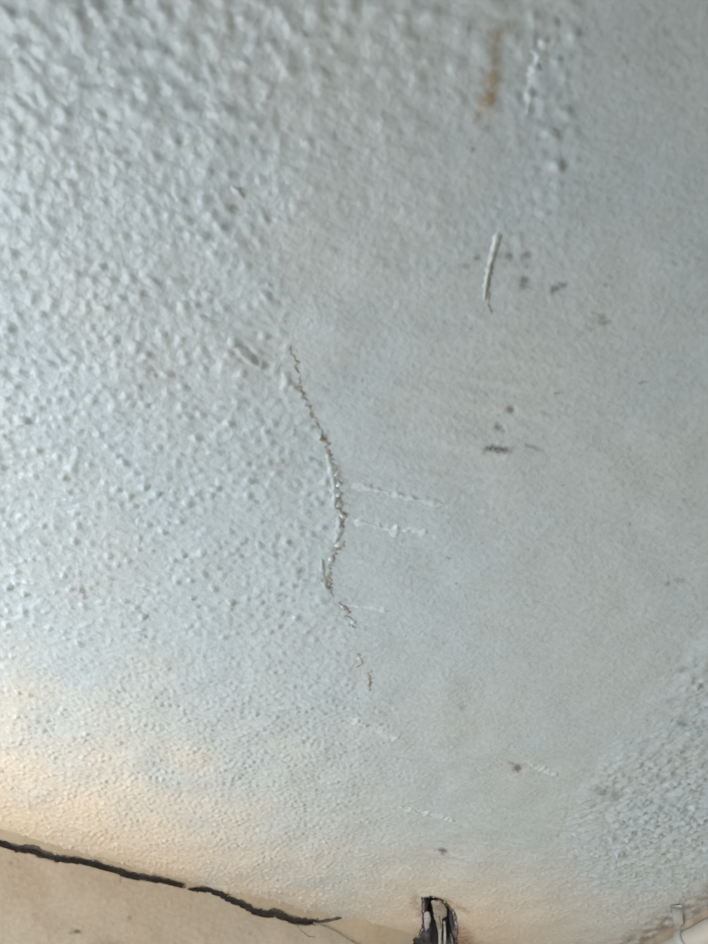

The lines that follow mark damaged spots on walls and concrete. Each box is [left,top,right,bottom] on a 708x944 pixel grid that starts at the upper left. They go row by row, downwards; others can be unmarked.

crack [289,345,357,628]
crack [357,654,373,691]
crack [0,840,359,944]
spalling [413,896,459,944]